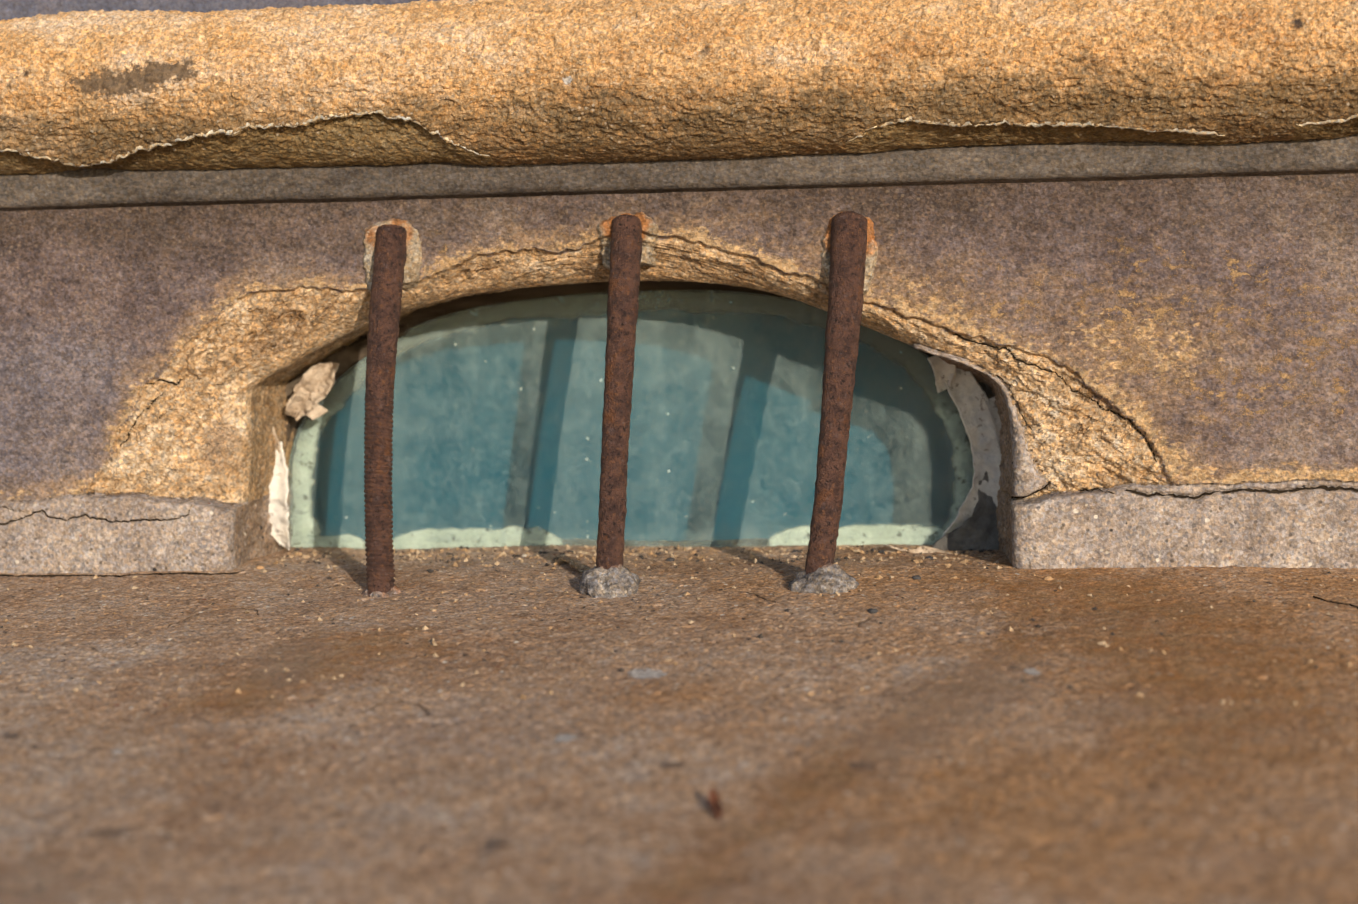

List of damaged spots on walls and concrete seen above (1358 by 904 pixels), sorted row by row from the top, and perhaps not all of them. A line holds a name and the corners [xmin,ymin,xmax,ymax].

leakage [65,56,198,100]
spalling [401,238,610,314]
spalling [640,234,829,311]
spalling [80,284,371,550]
spalling [860,301,1176,539]
crack [956,334,1358,499]
crack [0,506,191,525]